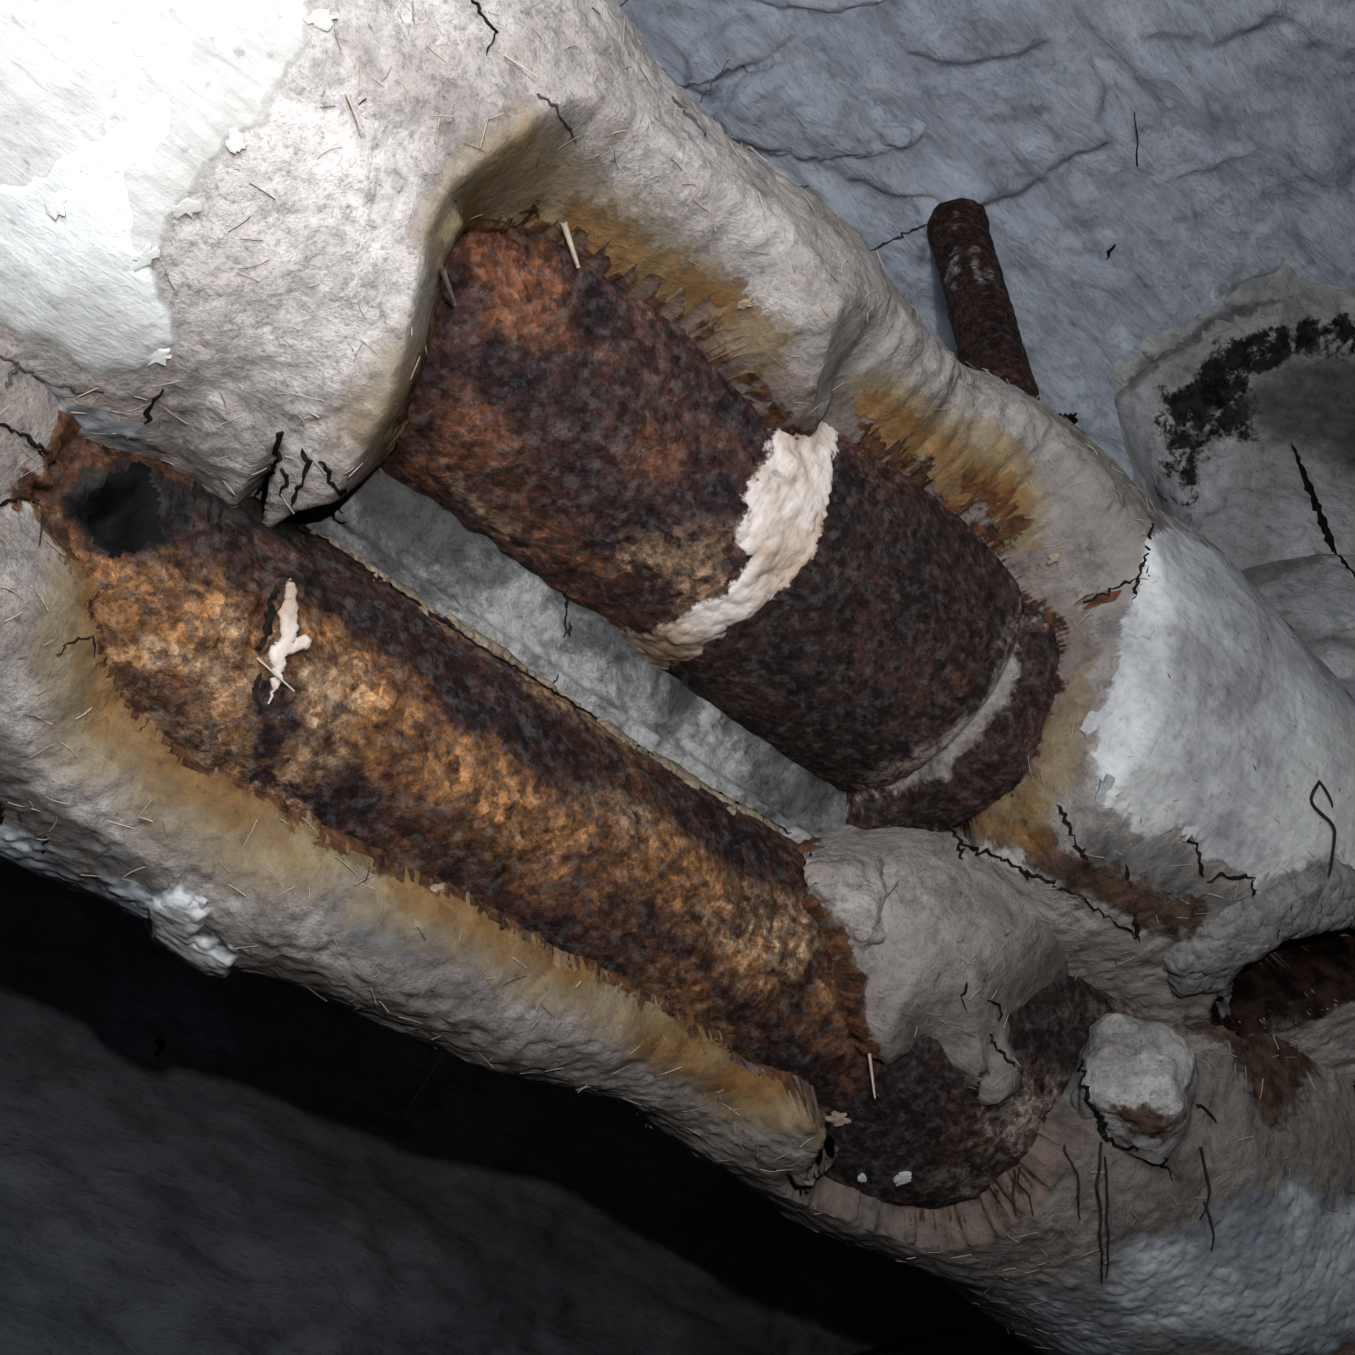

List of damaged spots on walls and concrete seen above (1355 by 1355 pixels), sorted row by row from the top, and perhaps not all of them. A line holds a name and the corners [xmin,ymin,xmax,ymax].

crack [471,0,499,54]
peeling [0,0,338,375]
corrosion [433,124,771,358]
crack [252,431,598,720]
flaking render [673,311,813,440]
flaking render [838,422,1069,757]
damp [1129,304,1355,521]
crack [1291,443,1355,578]
corrosion [53,576,344,875]
corrosion [371,871,809,1122]
crack [936,817,1141,942]
corrosion [969,711,1208,941]